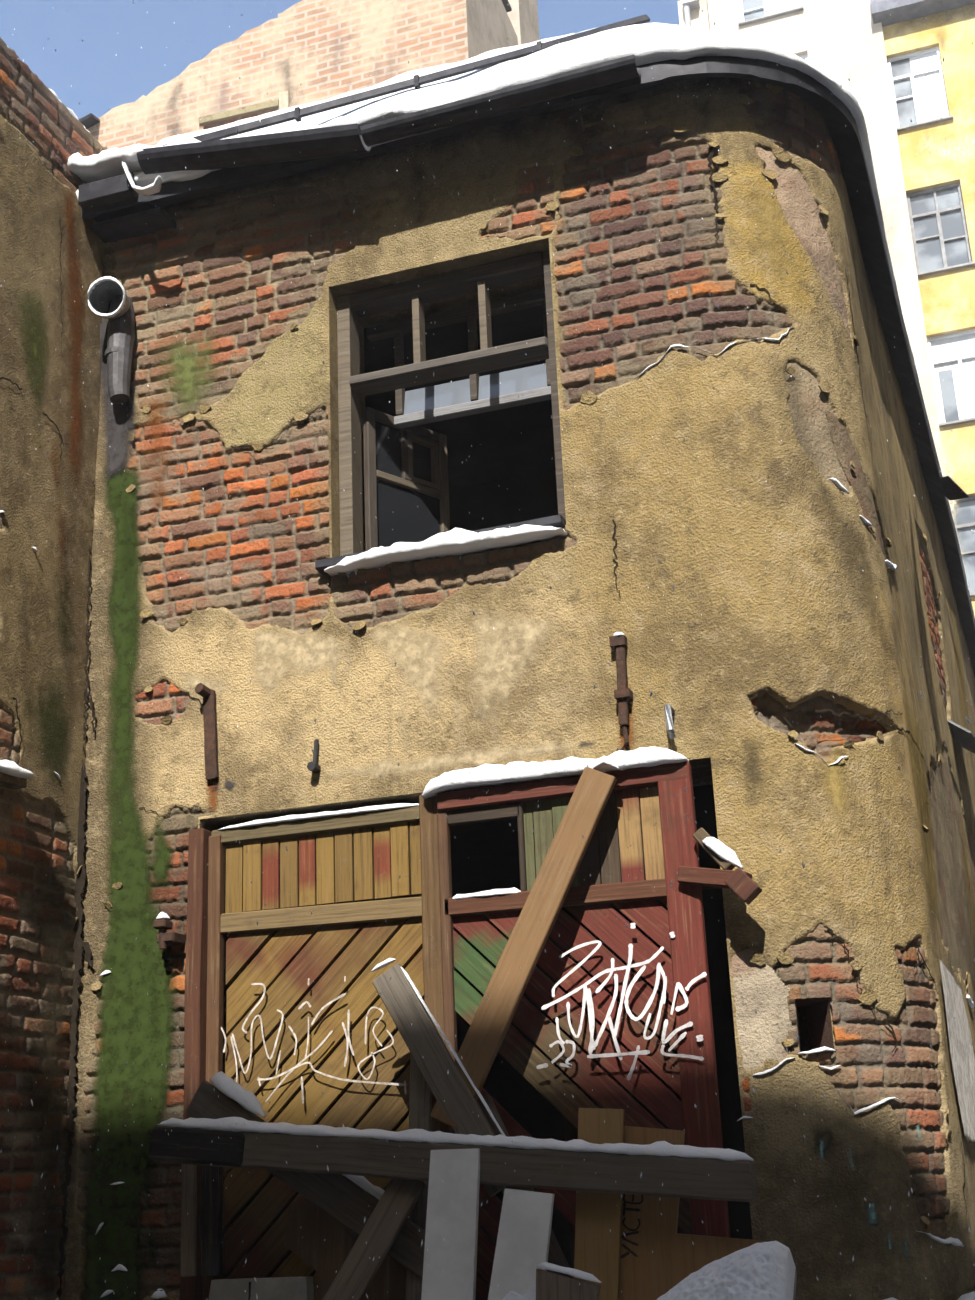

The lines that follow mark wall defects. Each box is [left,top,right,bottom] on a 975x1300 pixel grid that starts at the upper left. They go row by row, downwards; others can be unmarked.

crack [0,377,63,471]
flaking render [110,185,577,634]
crack [612,519,621,597]
flaking render [479,123,792,410]
crack [707,147,719,239]
crack [13,697,22,764]
flaking render [0,788,108,1300]
crack [56,481,95,1299]
leakage [153,829,171,882]
flaking render [145,806,213,1123]
corrosion [208,779,216,808]
flaking render [732,924,958,1239]